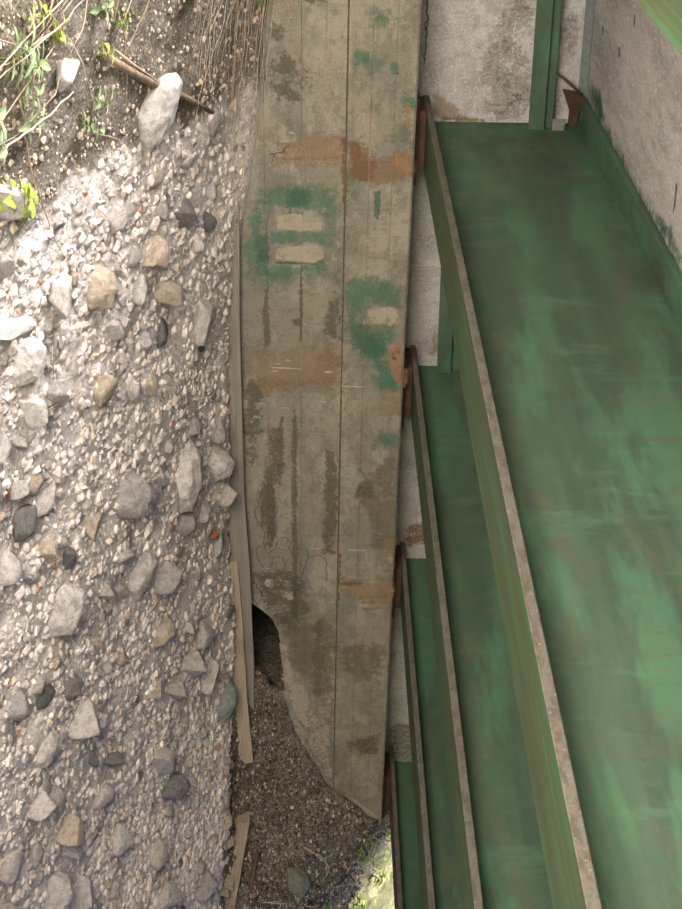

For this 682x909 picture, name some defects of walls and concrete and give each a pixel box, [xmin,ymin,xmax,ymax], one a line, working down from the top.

crack [422,0,430,66]
corrosion [341,99,415,216]
leakage [243,382,299,619]
crack [253,489,327,613]
leakage [321,449,366,558]